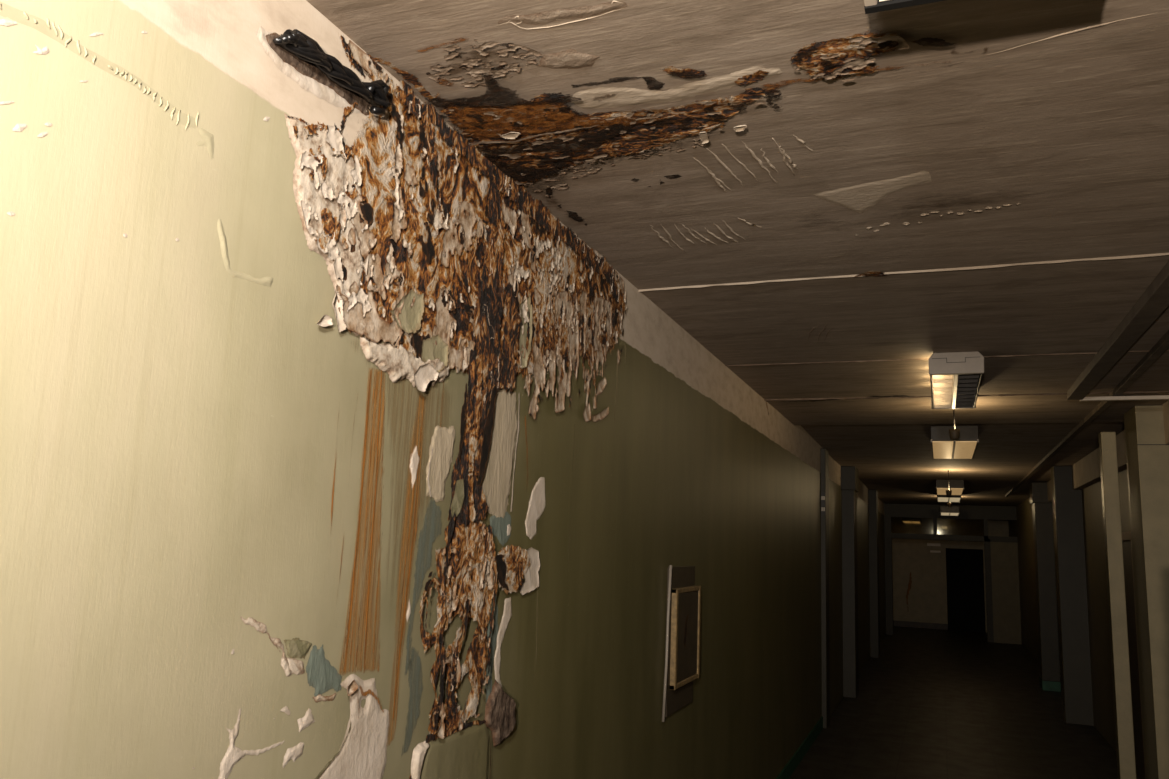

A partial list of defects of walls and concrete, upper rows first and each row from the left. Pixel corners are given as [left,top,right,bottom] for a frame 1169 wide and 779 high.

peeling [418,38,600,88]
flaking render [571,30,955,109]
peeling [284,114,449,392]
peeling [240,616,312,677]
peeling [218,674,390,779]
corrosion [340,369,385,674]
corrosion [388,396,424,744]
flaking render [406,289,626,747]